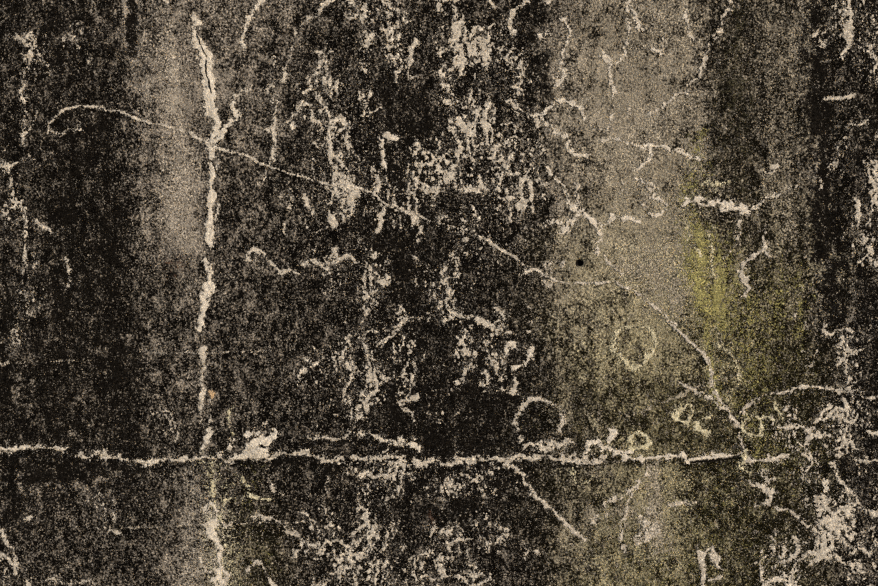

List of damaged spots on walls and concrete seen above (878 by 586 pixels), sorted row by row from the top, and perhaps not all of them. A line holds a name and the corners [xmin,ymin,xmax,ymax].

damp [232,79,280,104]
crack [47,0,609,286]
crack [528,0,744,280]
damp [0,0,243,586]
crack [195,258,217,332]
damp [245,0,878,550]
crack [0,528,32,586]
crack [1,440,68,456]
crack [75,346,240,468]
crack [223,475,284,503]
crack [248,281,878,559]
crack [770,505,831,568]